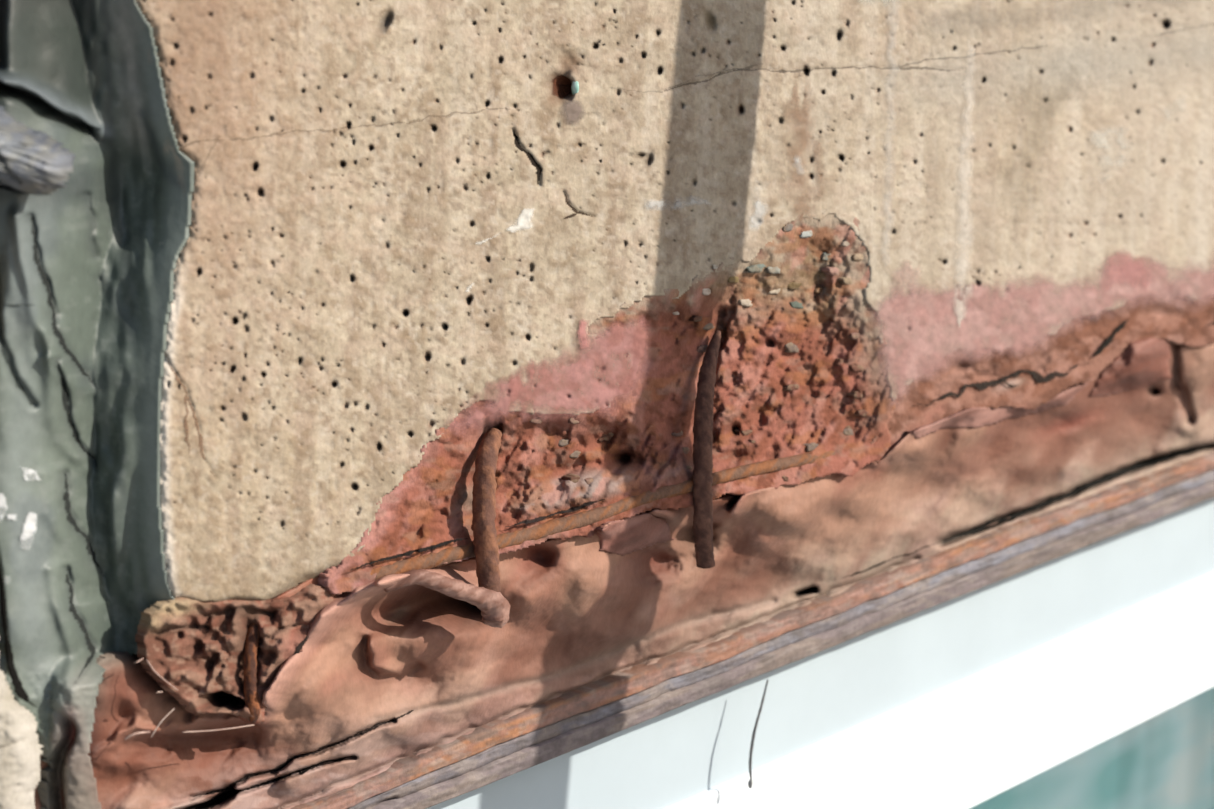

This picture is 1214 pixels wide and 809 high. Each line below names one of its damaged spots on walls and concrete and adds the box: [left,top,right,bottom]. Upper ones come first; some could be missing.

crack [513,131,590,219]
rust [457,319,650,427]
rust [879,261,1214,396]
crack [350,538,467,570]
crack [506,499,605,527]
spalling [135,211,1214,724]
crack [799,444,1214,594]
crack [294,636,308,655]
crack [184,710,414,809]